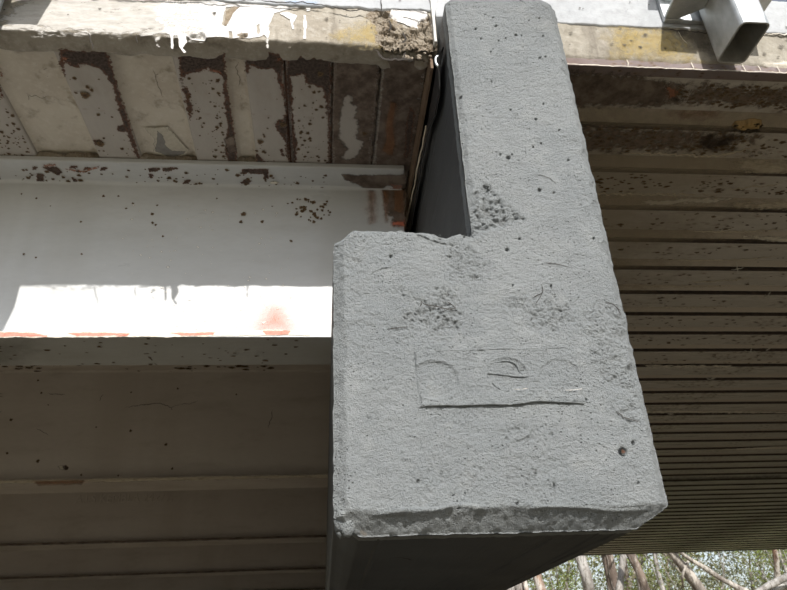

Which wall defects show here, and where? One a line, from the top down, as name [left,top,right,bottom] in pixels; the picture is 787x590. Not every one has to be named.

spalling [365,10,437,53]
peeling [0,0,381,165]
rust [569,71,787,112]
rust [0,109,30,156]
rust [125,80,277,186]
rust [294,84,326,162]
rust [582,125,787,158]
rust [15,165,113,182]
rust [287,198,331,223]